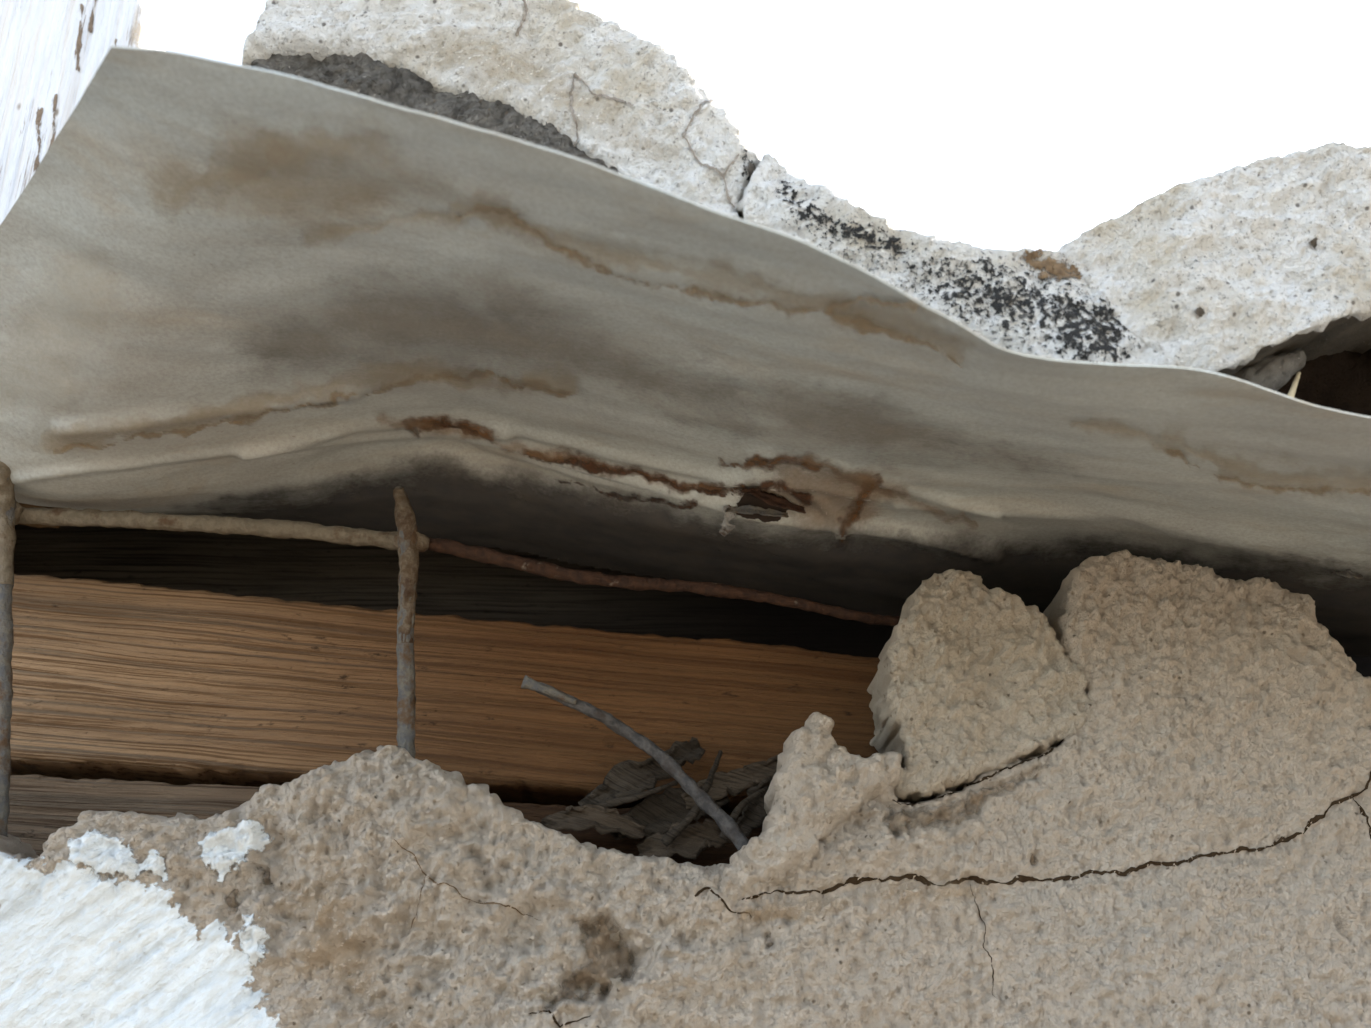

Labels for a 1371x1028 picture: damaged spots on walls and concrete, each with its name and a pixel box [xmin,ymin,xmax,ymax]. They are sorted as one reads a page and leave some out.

crack [515,0,528,37]
crack [569,72,634,147]
crack [682,99,740,208]
leakage [456,206,634,282]
leakage [667,286,962,368]
leakage [373,371,570,397]
corrosion [0,461,17,585]
corrosion [839,475,883,542]
corrosion [393,487,419,643]
crack [893,739,1064,805]
peeling [0,819,281,1028]
crack [694,771,1371,998]